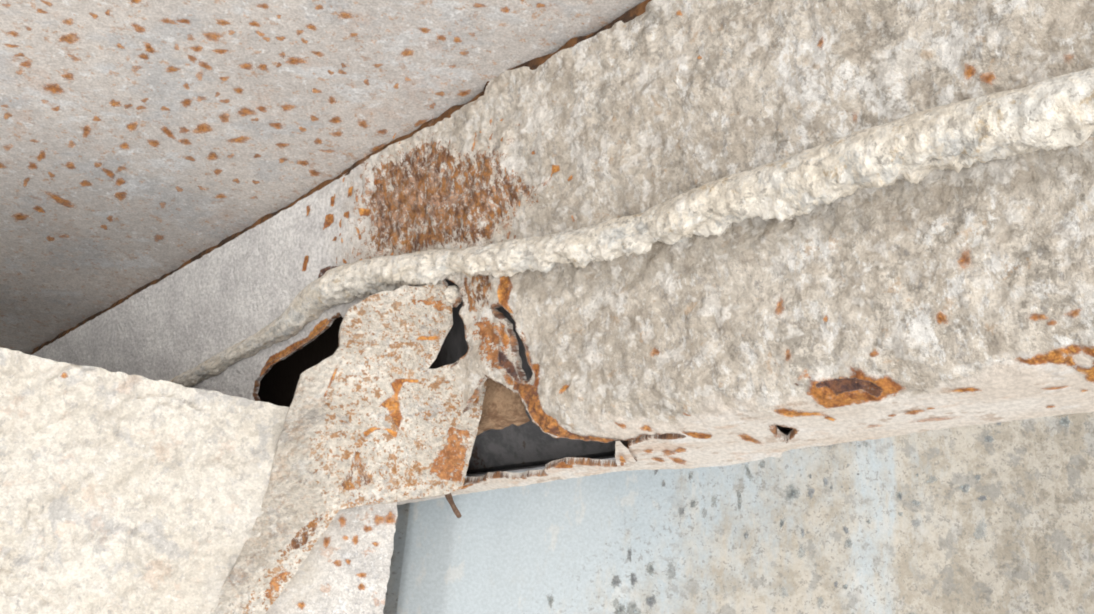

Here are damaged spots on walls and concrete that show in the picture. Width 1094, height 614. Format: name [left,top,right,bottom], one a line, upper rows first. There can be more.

corrosion [59,19,80,61]
corrosion [239,21,324,70]
corrosion [42,74,74,111]
corrosion [148,18,281,161]
corrosion [323,92,573,264]
peeling [260,319,329,377]
corrosion [1017,344,1094,392]
corrosion [774,367,904,421]
corrosion [281,514,330,557]
corrosion [339,511,396,546]
corrosion [265,570,288,599]
corrosion [333,559,366,590]